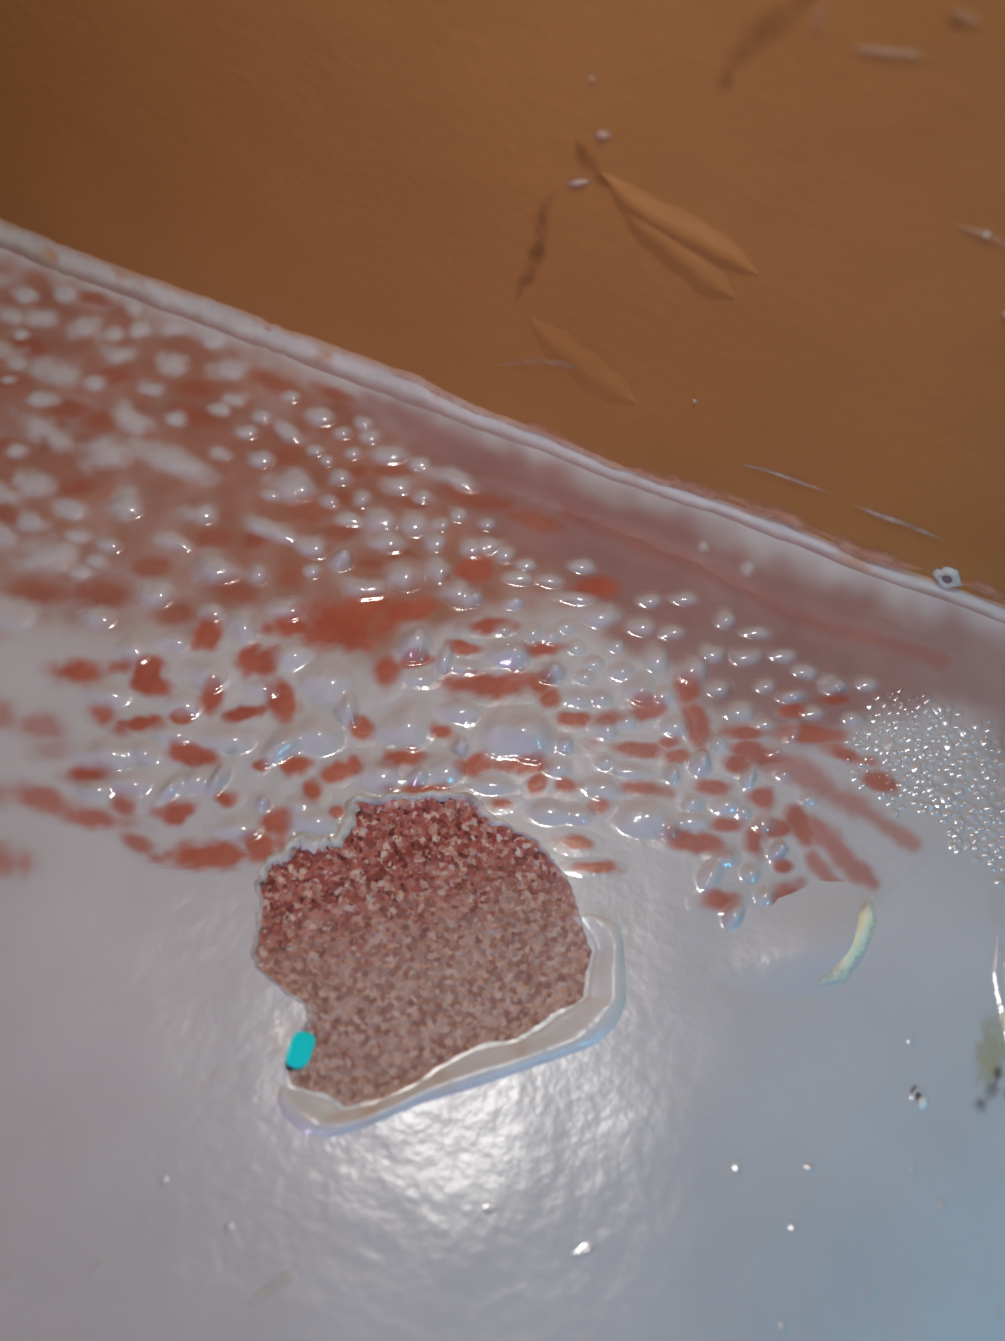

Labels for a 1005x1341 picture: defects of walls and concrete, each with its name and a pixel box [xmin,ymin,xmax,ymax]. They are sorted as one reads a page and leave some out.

rust [0,248,946,928]
flaking render [250,790,627,1138]